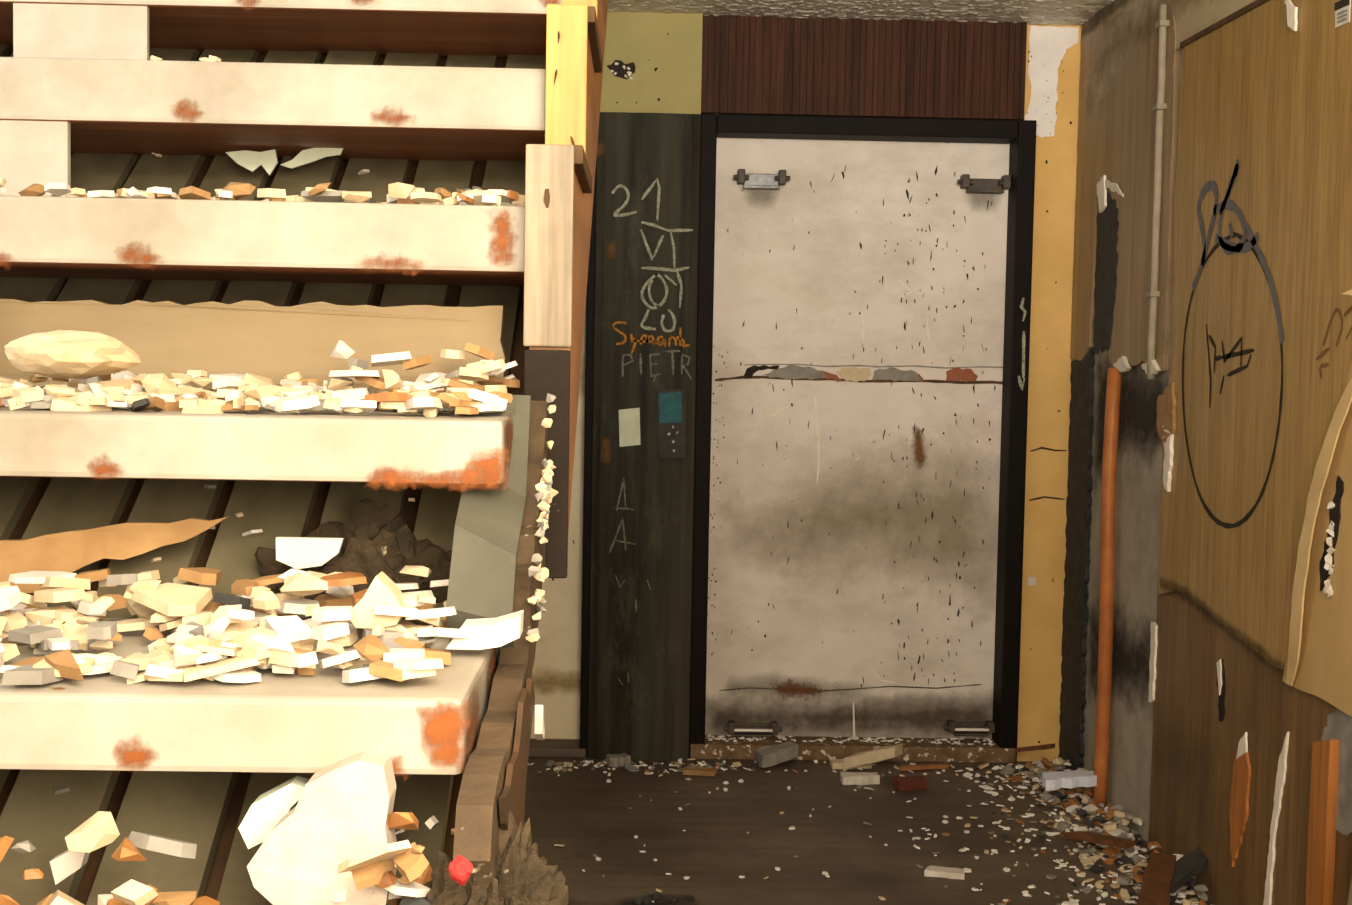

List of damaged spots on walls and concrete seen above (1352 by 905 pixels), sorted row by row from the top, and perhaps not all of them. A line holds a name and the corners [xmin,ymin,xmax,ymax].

rust [175,100,201,121]
peeling [1024,25,1079,138]
rust [490,211,513,263]
flaking render [885,172,983,330]
rust [370,418,513,490]
rust [914,428,924,465]
damp [854,493,970,554]
flaking render [891,619,960,685]
rust [421,647,496,765]
damp [711,702,992,736]
flaking render [1321,708,1352,836]